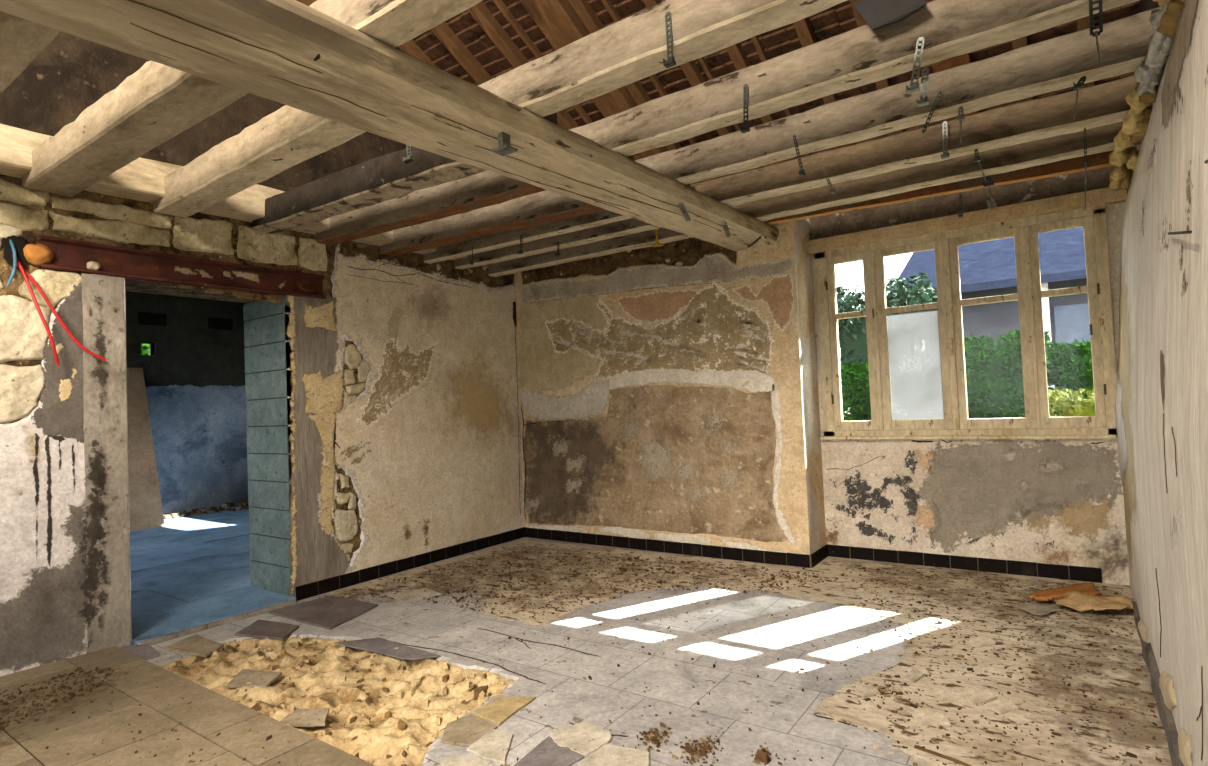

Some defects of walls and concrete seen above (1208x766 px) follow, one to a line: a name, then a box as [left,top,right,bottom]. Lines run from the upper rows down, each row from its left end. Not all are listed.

spalling [2,235,27,271]
peeling [59,368,77,401]
damp [30,433,112,643]
damp [89,296,109,408]
spalling [286,295,348,597]
flaking render [336,237,796,553]
peeling [830,447,935,546]